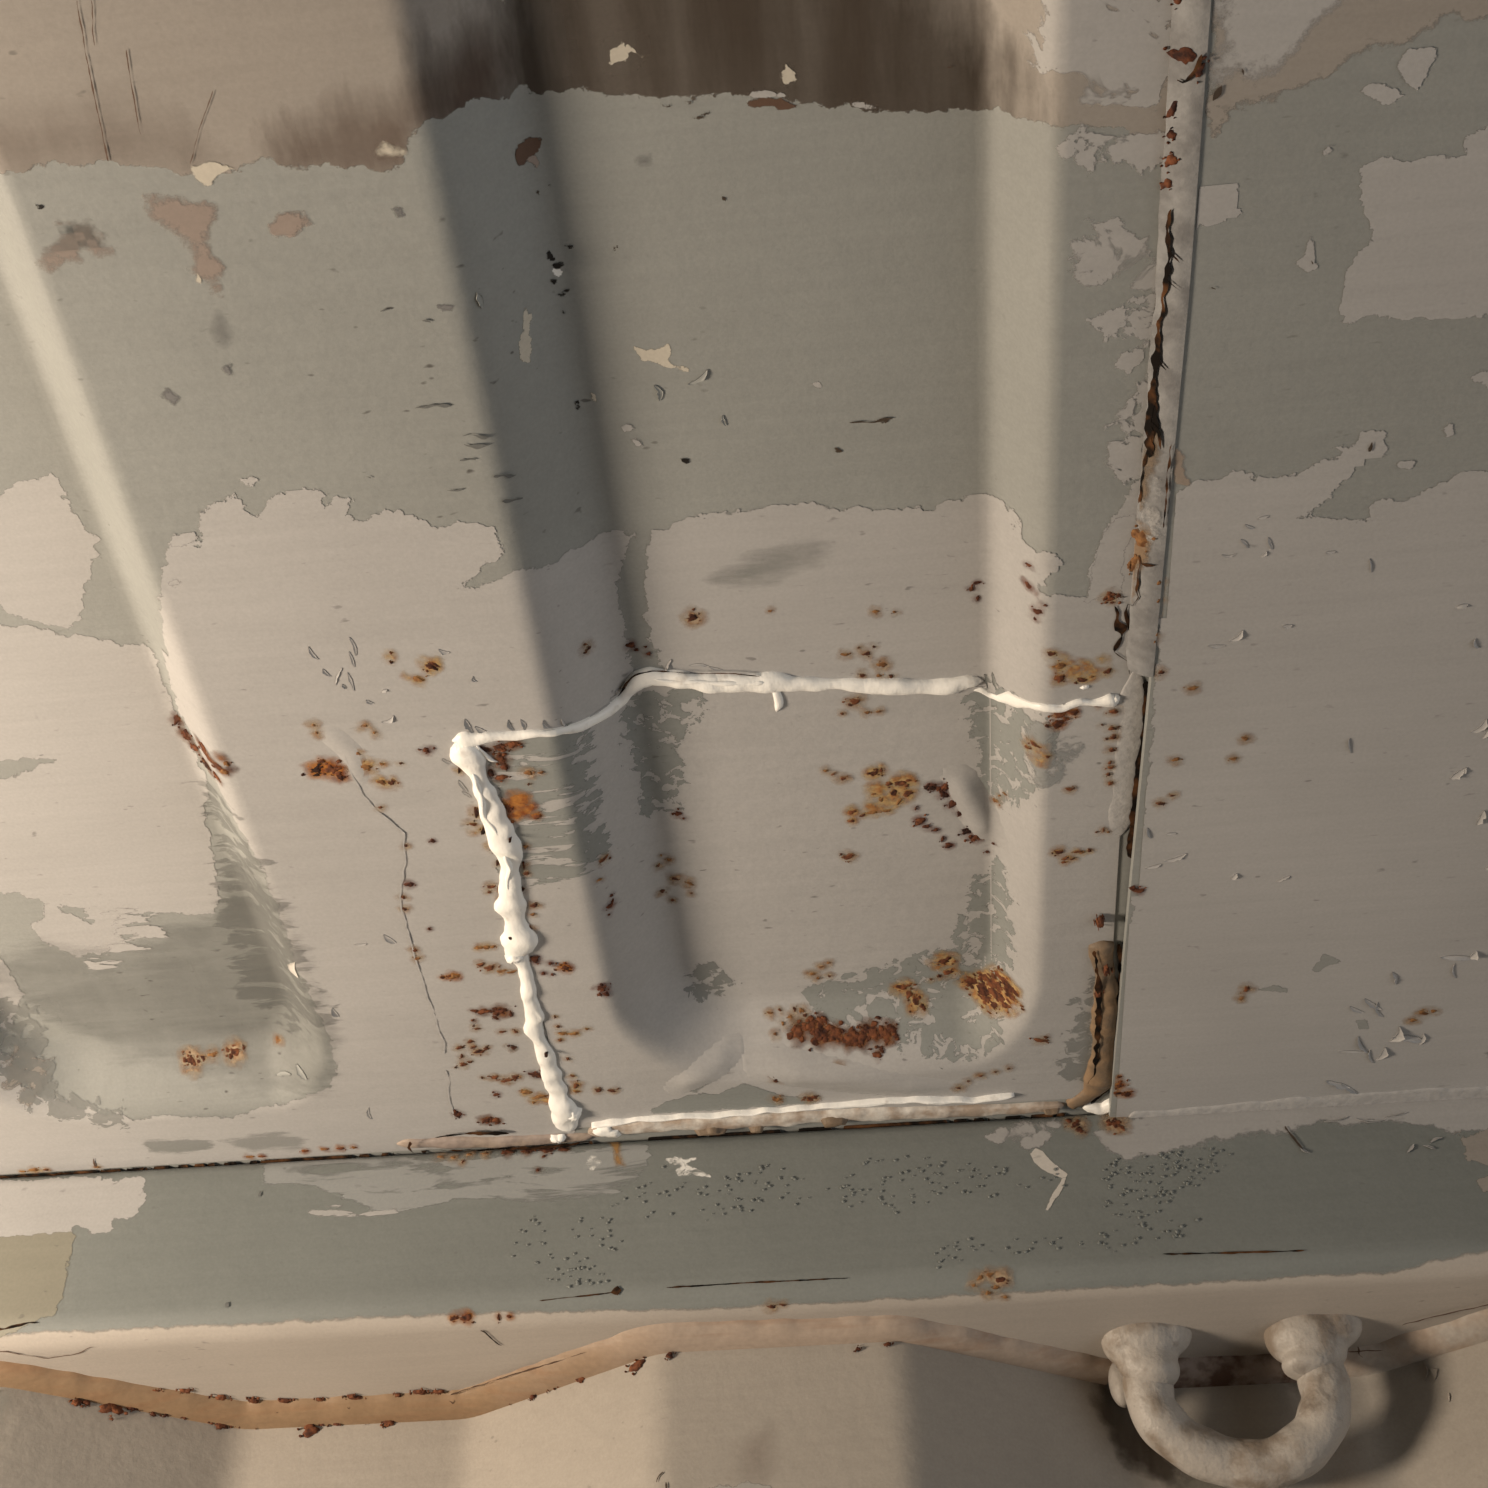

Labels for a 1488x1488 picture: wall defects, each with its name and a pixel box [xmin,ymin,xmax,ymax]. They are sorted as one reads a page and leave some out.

peeling [747,64,797,110]
peeling [1025,0,1172,108]
peeling [1209,0,1341,84]
corrosion [1159,101,1180,191]
peeling [1338,126,1488,324]
crack [1138,210,1179,528]
crack [1113,555,1155,675]
corrosion [172,715,233,783]
corrosion [301,752,403,787]
peeling [0,217,1488,1174]
corrosion [823,764,995,853]
corrosion [764,953,1024,1065]